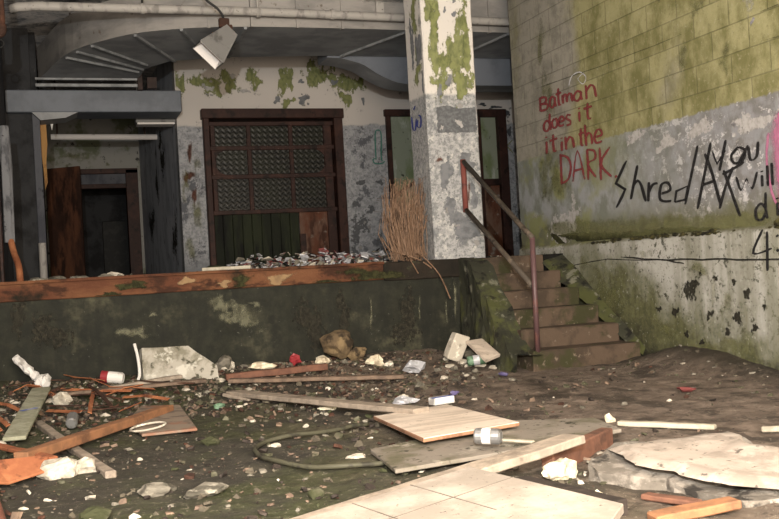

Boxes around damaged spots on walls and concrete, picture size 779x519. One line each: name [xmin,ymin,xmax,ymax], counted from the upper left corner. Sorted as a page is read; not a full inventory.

crack [574,257,779,266]